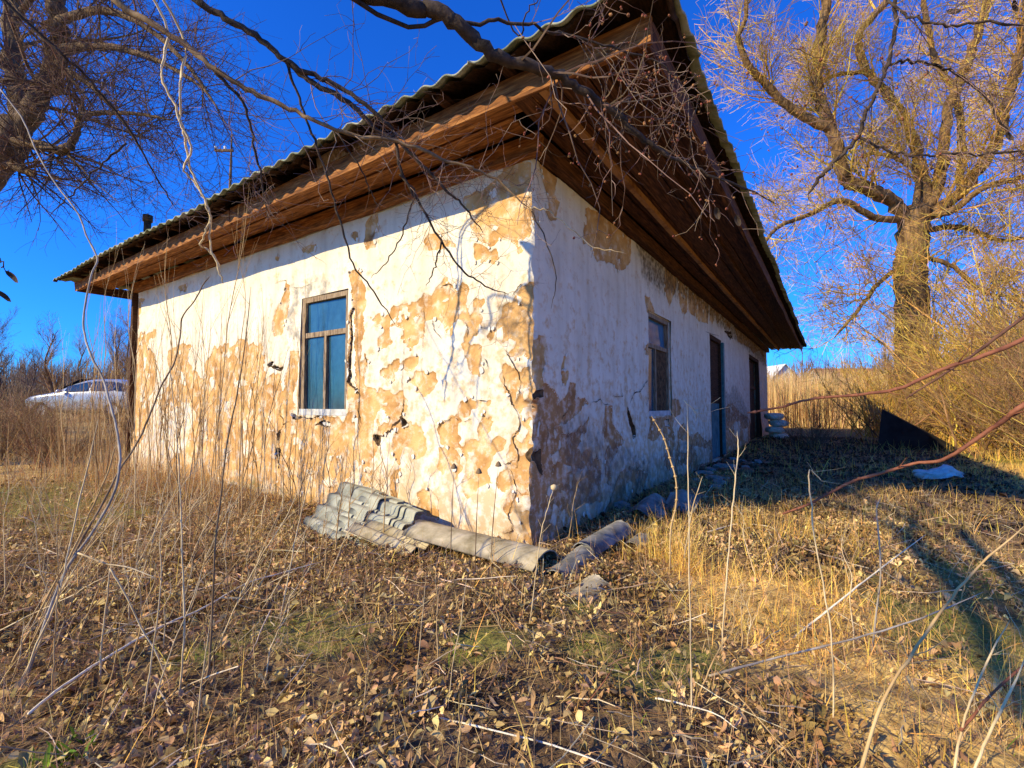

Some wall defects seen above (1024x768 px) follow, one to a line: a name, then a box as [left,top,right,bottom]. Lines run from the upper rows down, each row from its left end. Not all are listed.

peeling [350,214,378,250]
peeling [424,233,456,251]
peeling [462,162,560,265]
peeling [583,207,631,273]
peeling [131,267,713,546]
crack [439,350,521,534]